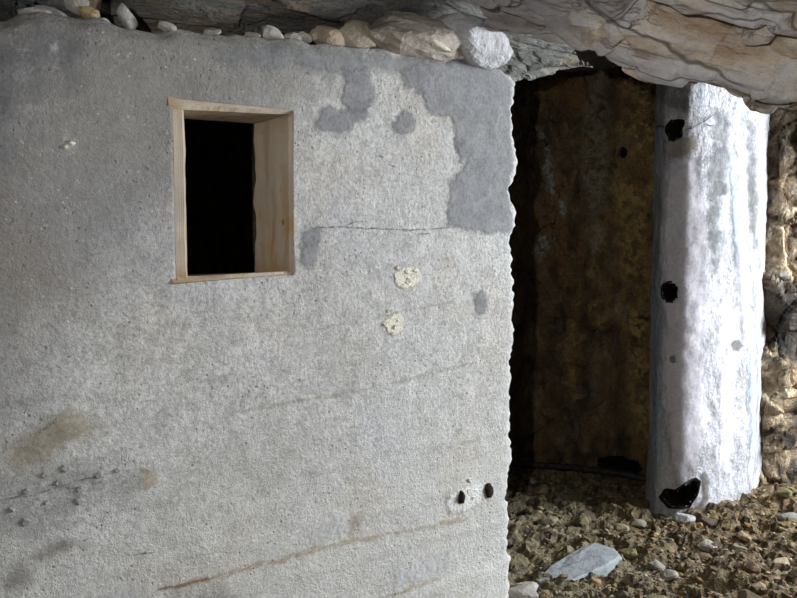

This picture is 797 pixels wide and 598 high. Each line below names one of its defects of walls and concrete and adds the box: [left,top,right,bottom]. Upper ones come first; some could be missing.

leakage [224,47,514,234]
spalling [665,118,686,142]
crack [319,221,442,235]
spalling [660,281,679,303]
spalling [658,476,702,510]
rust [160,536,377,590]